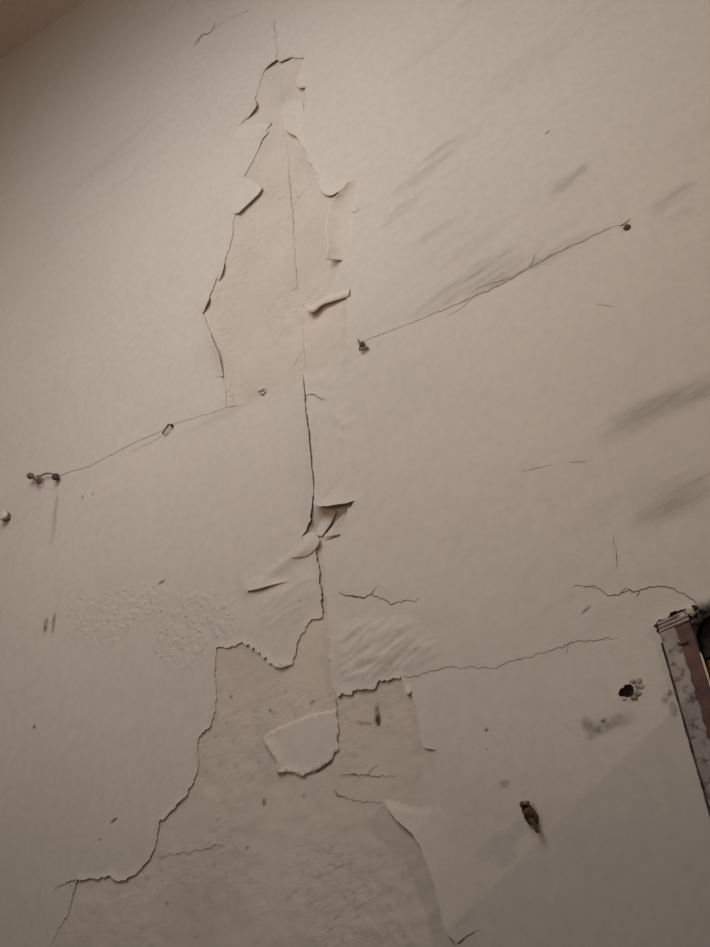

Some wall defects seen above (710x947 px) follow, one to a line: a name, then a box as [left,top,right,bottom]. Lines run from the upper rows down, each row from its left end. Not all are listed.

peeling [200,57,359,408]
crack [356,224,625,344]
crack [59,405,236,476]
peeling [291,510,347,558]
crack [339,587,419,605]
crack [404,638,614,678]
peeling [50,613,456,947]